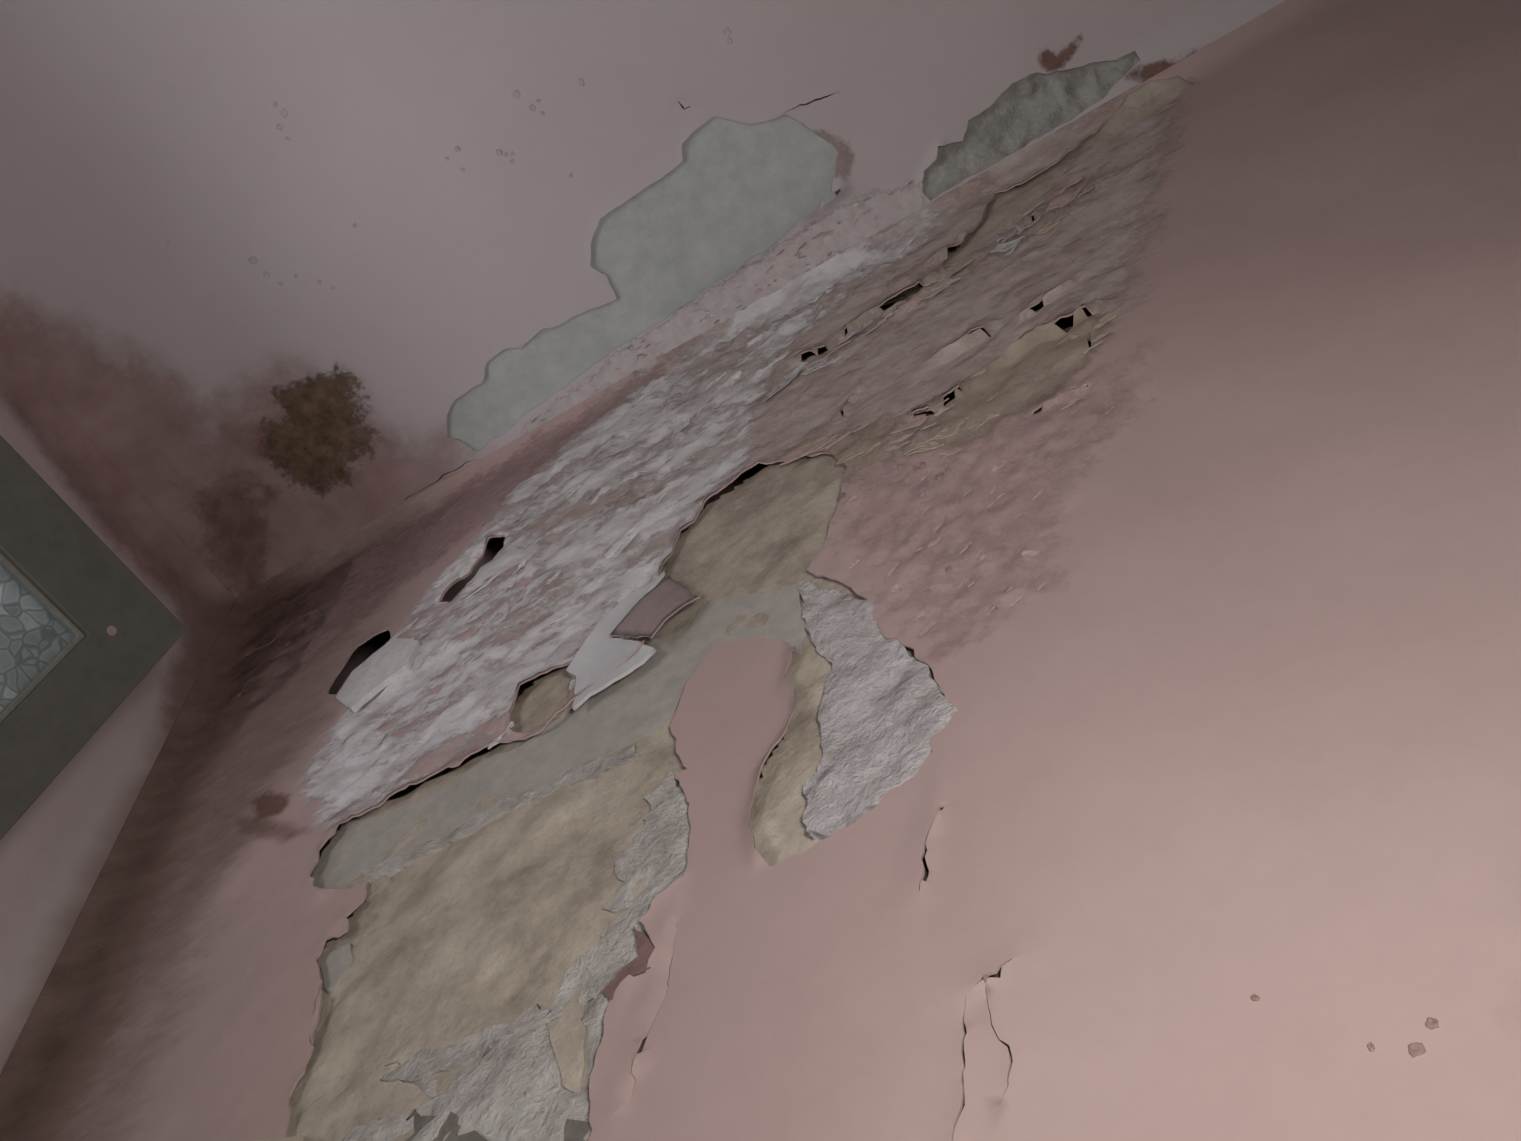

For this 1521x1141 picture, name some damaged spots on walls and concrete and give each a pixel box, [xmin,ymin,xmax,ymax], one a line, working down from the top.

damp [0,208,949,1141]
flaking render [253,51,1194,1141]
crack [921,846,929,881]